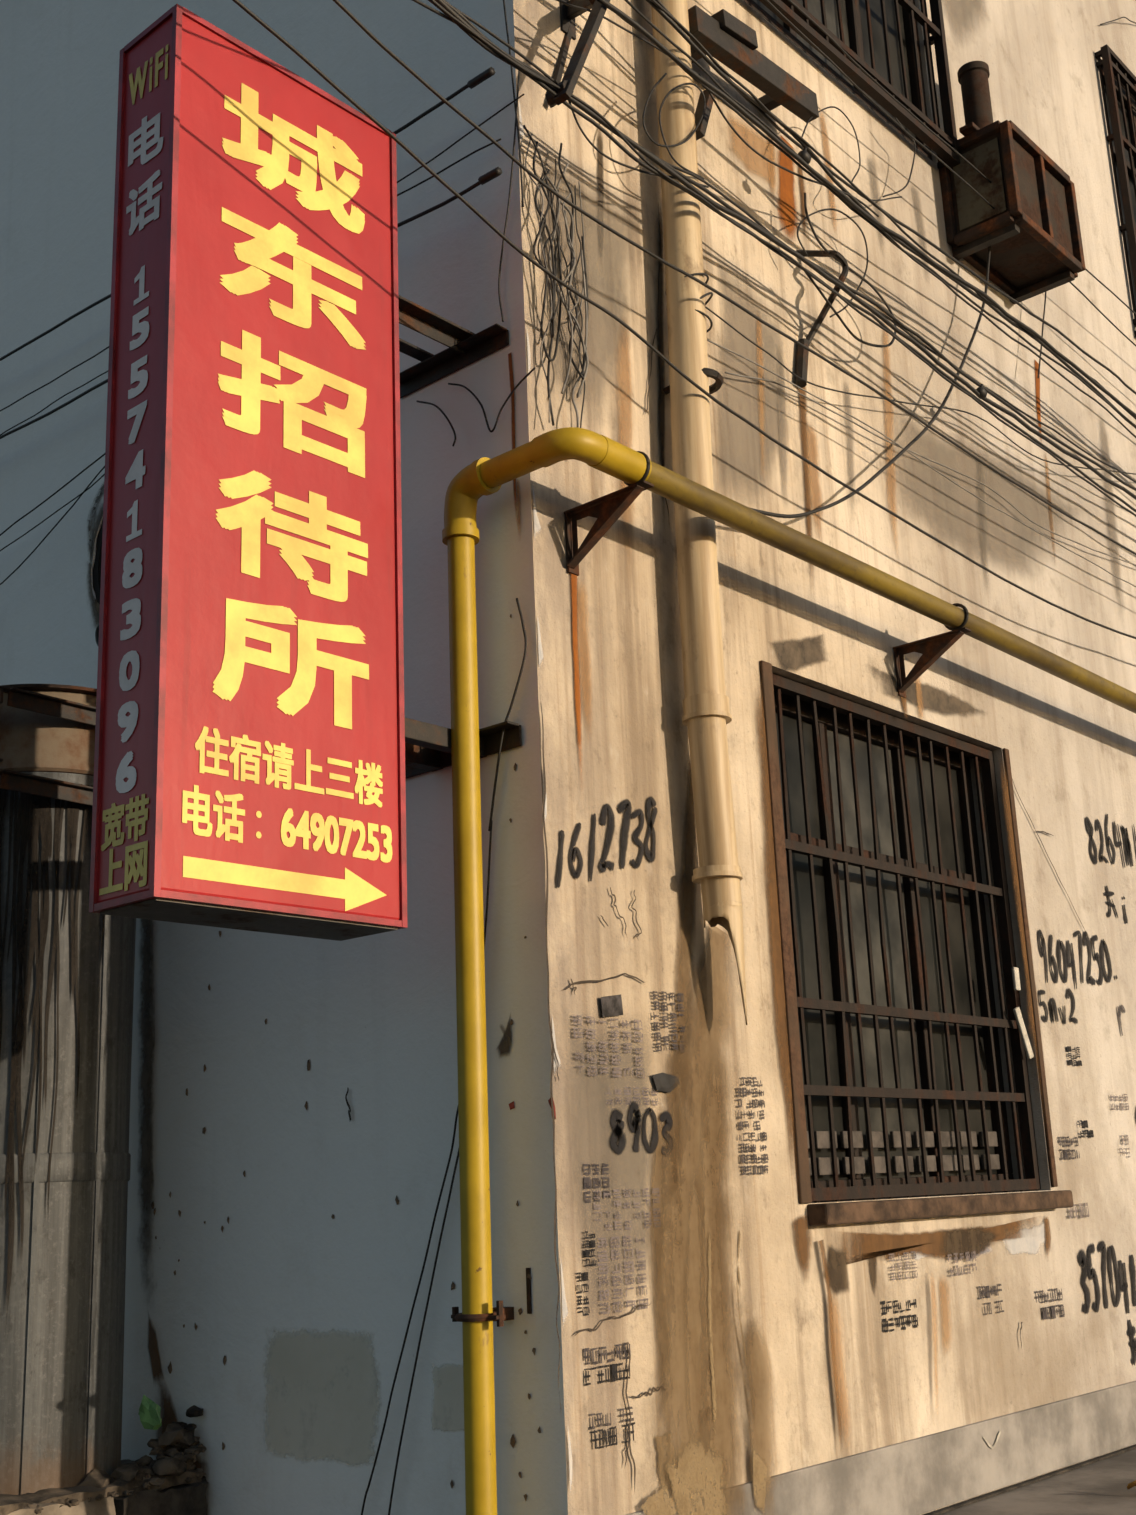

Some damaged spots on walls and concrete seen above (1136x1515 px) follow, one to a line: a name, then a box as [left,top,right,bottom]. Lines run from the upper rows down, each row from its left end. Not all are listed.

rust [732,120,806,238]
rust [571,573,591,762]
leakage [575,768,774,1515]